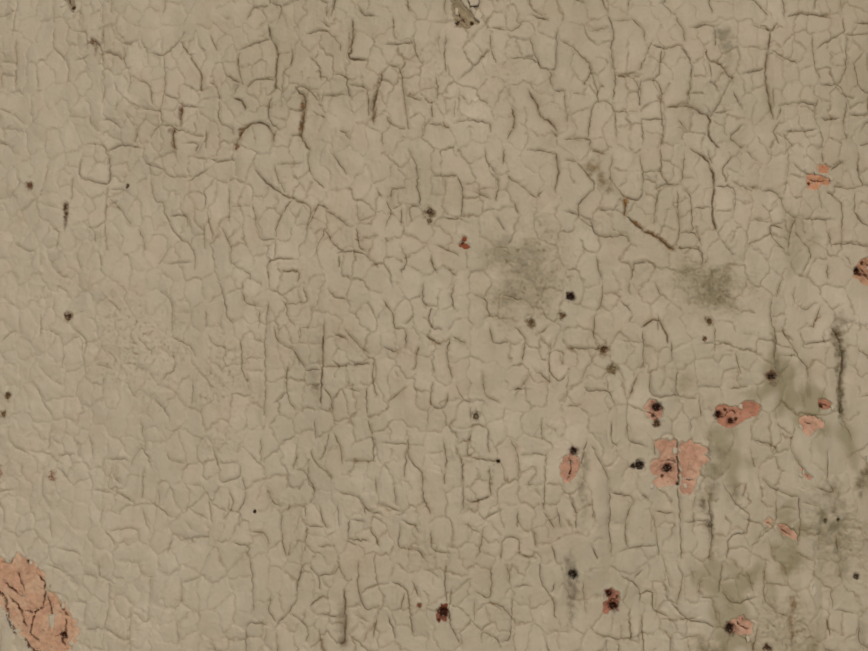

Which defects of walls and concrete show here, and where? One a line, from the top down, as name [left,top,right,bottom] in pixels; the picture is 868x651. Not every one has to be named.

peeling [806,164,833,190]
peeling [853,258,868,286]
peeling [643,399,665,426]
peeling [714,401,761,428]
peeling [799,399,834,437]
peeling [559,446,580,483]
peeling [650,438,709,496]
peeling [0,552,80,651]
peeling [600,588,620,614]
peeling [726,615,753,643]